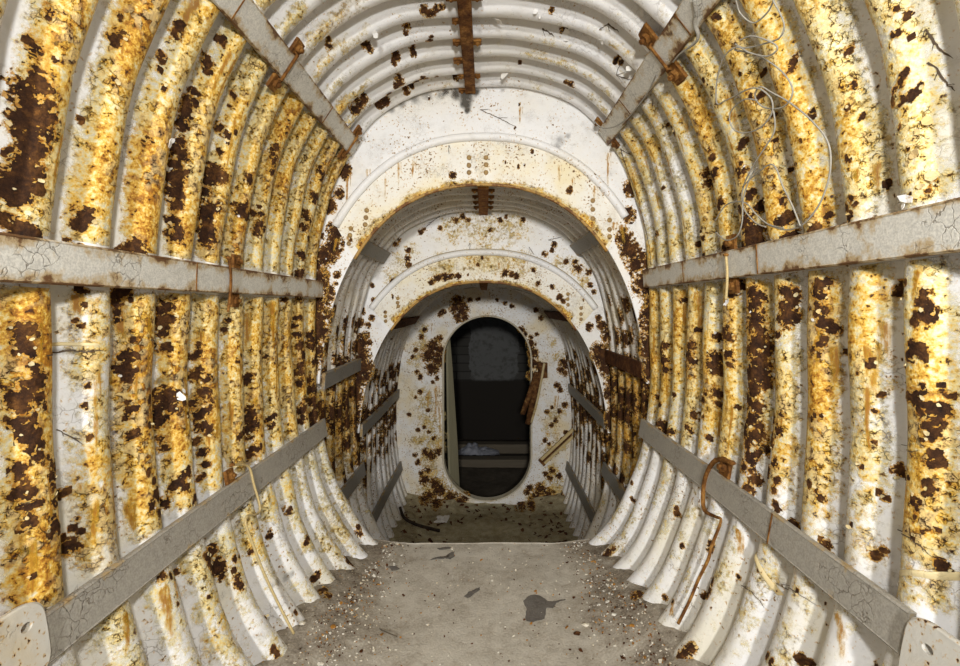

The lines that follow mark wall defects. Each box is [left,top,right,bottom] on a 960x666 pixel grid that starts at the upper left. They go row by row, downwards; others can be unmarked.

peeling [0,61,60,238]
rust [0,0,627,279]
rust [607,0,960,268]
rust [391,211,573,323]
peeling [891,278,940,369]
peeling [2,320,84,557]
rust [0,285,372,666]
rust [410,386,457,500]
rust [596,258,960,628]
peeling [906,382,956,498]
rust [765,622,795,666]